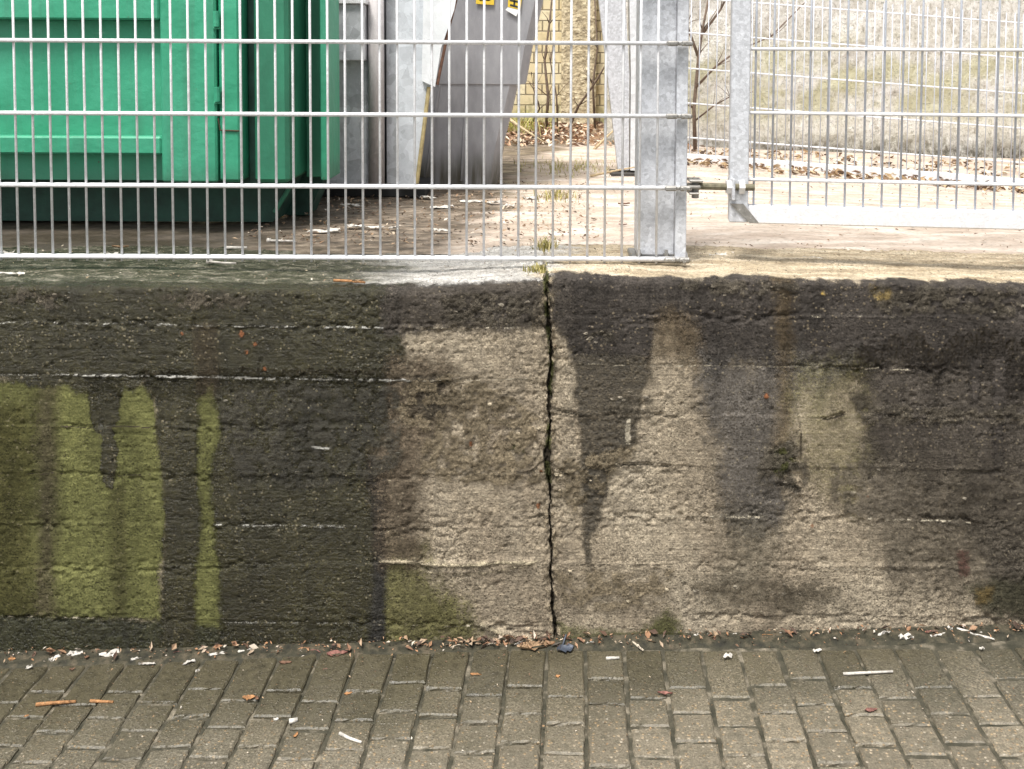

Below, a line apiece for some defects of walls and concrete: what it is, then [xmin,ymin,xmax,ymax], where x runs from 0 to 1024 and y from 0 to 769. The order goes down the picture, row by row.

damp [0,280,480,652]
crack [516,270,712,638]
damp [545,270,1024,618]